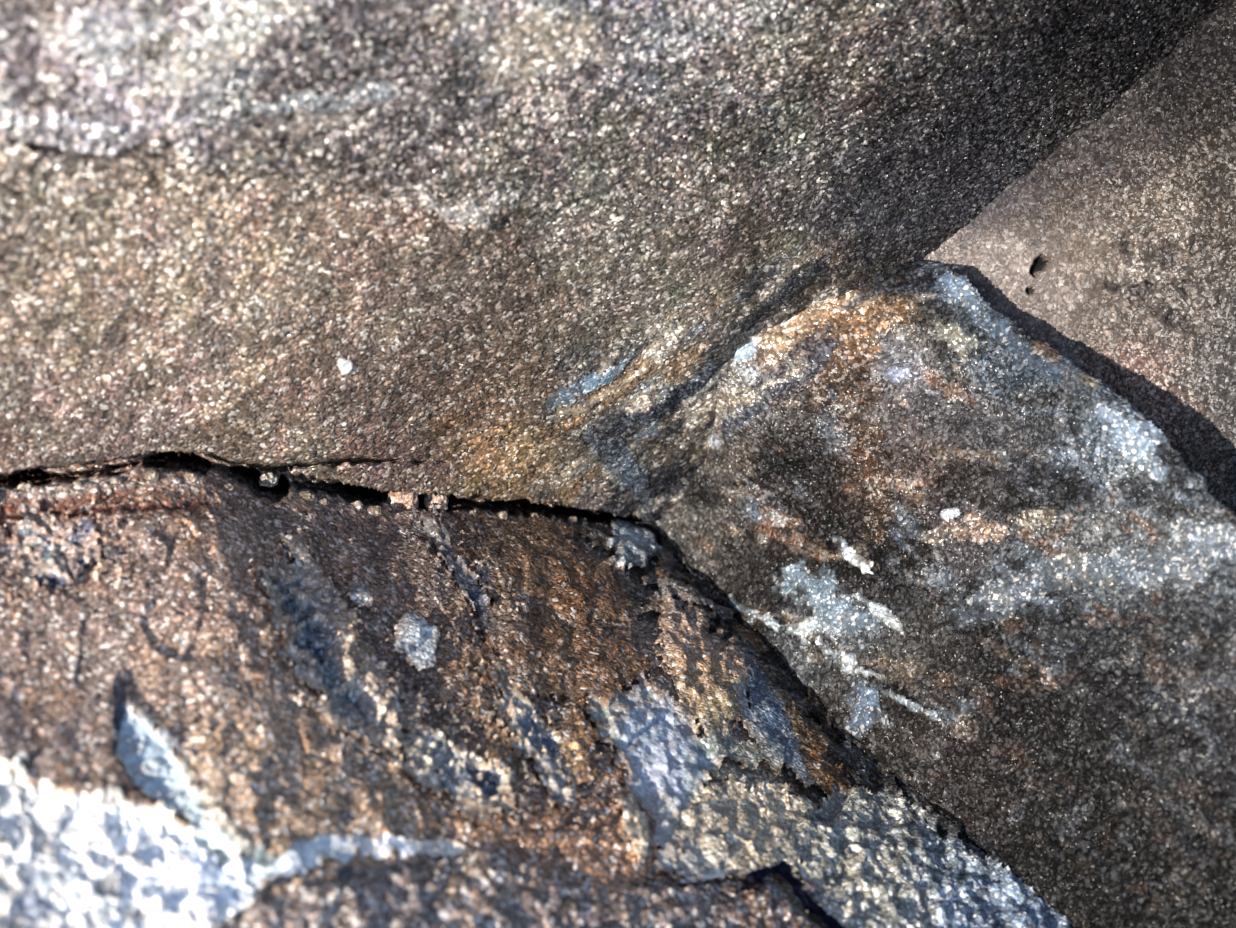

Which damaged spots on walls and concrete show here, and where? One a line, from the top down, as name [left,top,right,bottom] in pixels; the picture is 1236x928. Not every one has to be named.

damp [681,253,1068,415]
rust [0,475,256,533]
crack [0,451,434,502]
crack [418,494,672,544]
rust [468,418,653,785]
damp [545,351,984,741]
damp [932,510,1236,635]
efflorescence [1092,402,1172,484]
spalling [0,482,1071,928]
efflorescence [729,649,820,788]
damp [1147,685,1226,738]
crack [732,861,845,928]